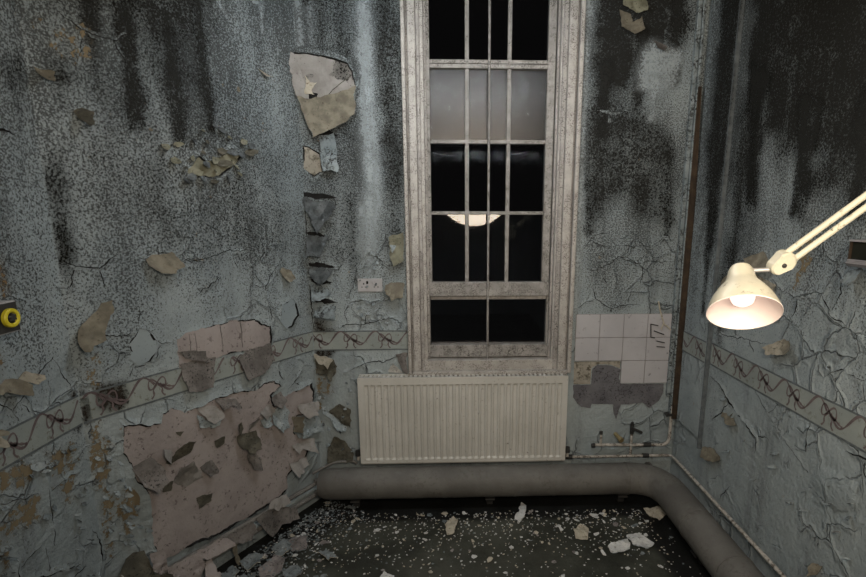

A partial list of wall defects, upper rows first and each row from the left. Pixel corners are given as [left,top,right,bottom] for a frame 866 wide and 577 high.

leakage [50,0,299,272]
peeling [289,46,361,182]
leakage [293,0,404,285]
leakage [573,0,696,312]
leakage [700,0,866,313]
crack [62,253,120,289]
peeling [302,192,338,320]
crack [776,275,866,354]
flaking render [0,295,355,577]
peeling [573,361,664,418]
crack [710,376,767,453]
crack [845,449,866,495]